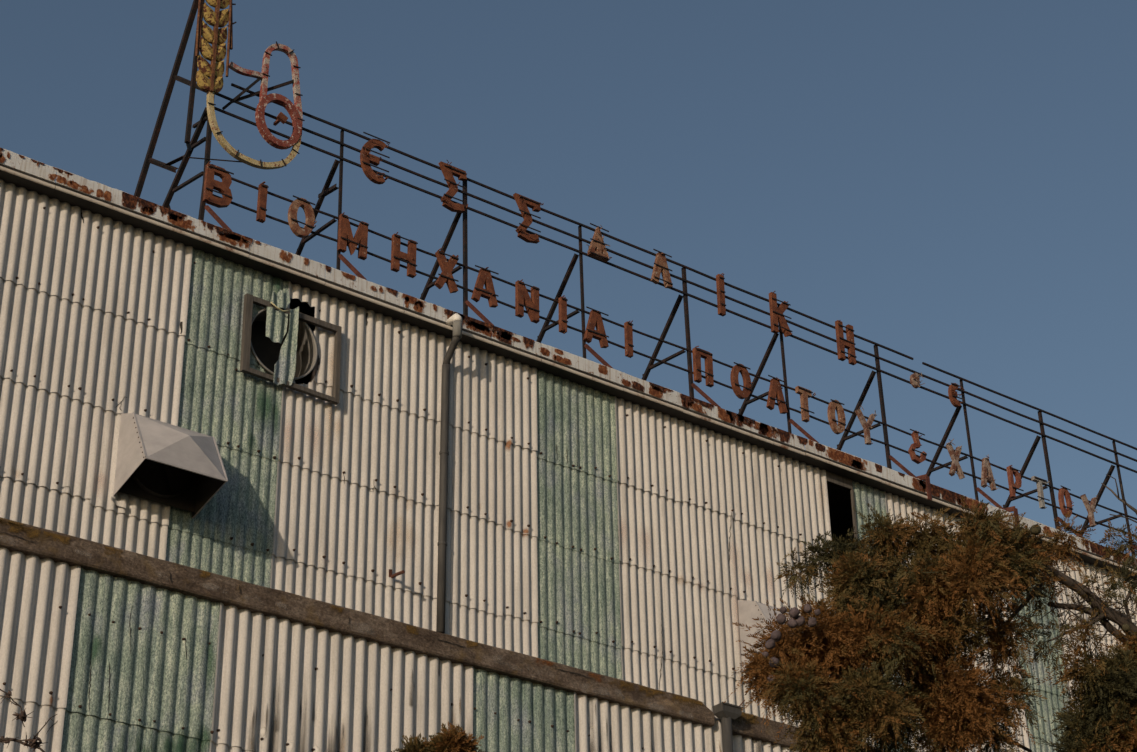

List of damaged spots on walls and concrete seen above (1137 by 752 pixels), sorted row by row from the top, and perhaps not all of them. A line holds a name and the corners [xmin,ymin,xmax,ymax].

corrosion [0,148,260,248]
corrosion [279,250,309,265]
corrosion [371,286,572,365]
corrosion [622,379,882,473]
corrosion [898,472,988,512]
corrosion [1083,539,1137,566]
leakage [250,696,344,752]